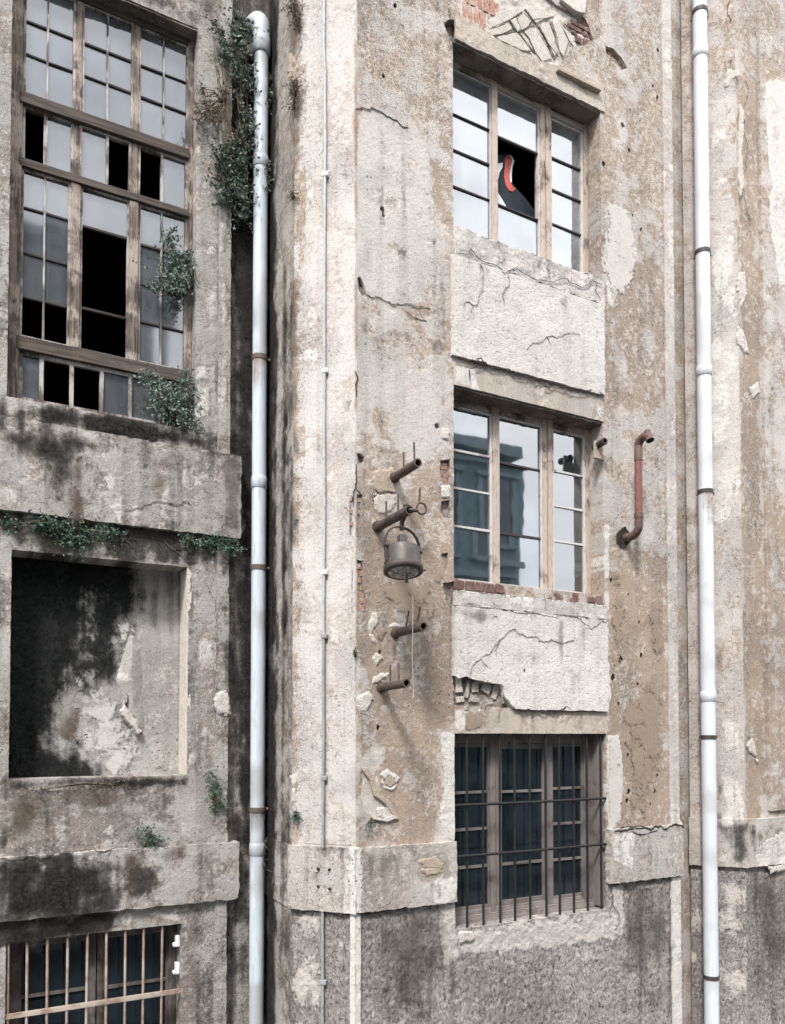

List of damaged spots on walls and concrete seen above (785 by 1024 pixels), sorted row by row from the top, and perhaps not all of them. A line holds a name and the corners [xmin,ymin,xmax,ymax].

flaking render [445,0,592,65]
crack [356,107,409,128]
crack [457,248,602,311]
peeling [602,202,637,297]
leakage [4,407,201,482]
leakage [29,494,110,546]
crack [458,597,608,674]
leakage [8,557,186,804]
flaking render [453,676,507,708]
peeling [361,767,399,822]
crack [615,823,684,835]
leakage [2,858,112,946]